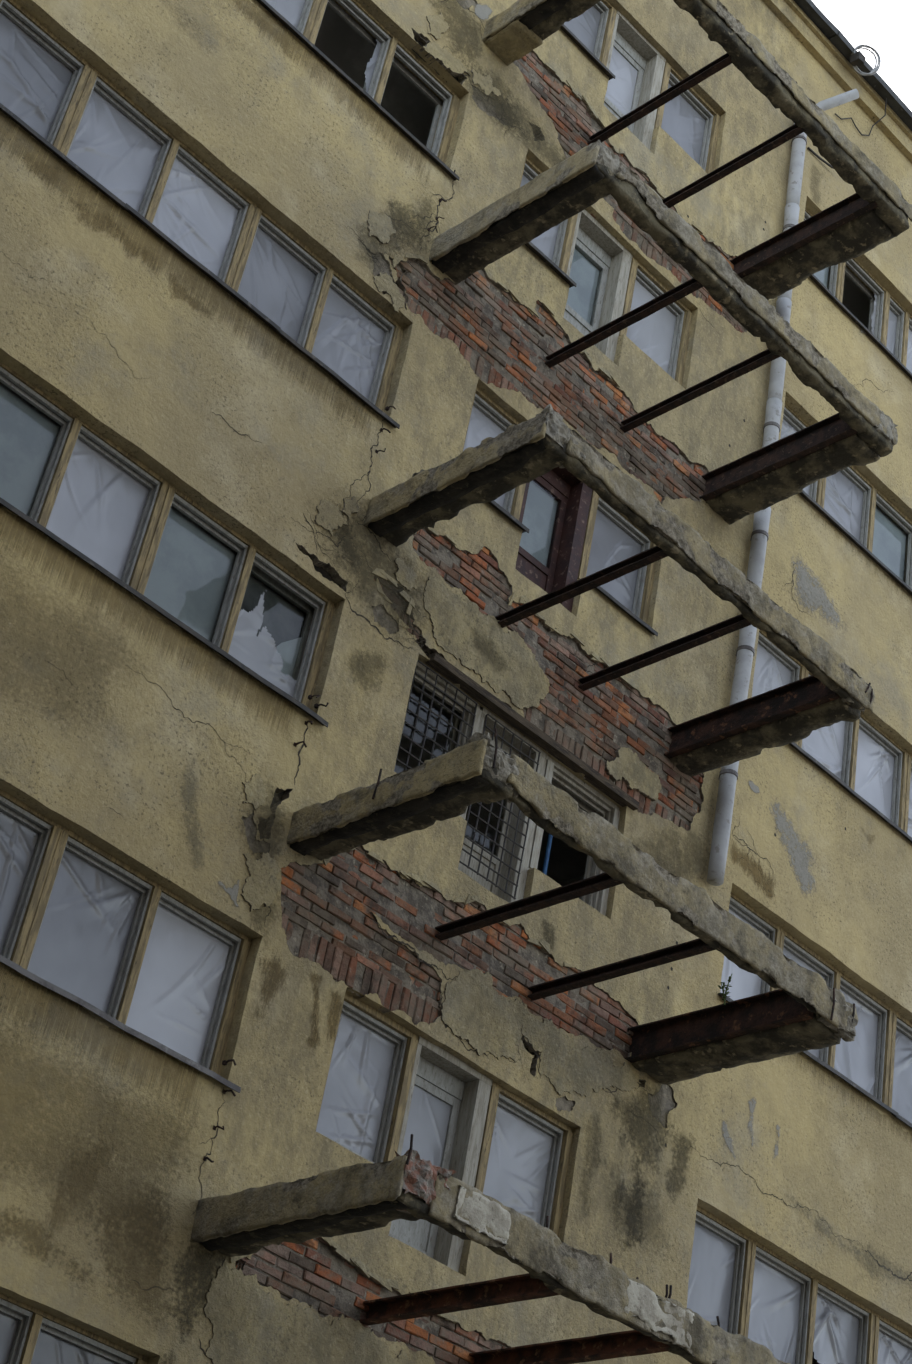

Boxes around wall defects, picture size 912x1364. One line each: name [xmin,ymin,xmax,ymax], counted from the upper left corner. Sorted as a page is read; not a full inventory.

flaking render [411,13,509,126]
flaking render [367,210,709,504]
flaking render [372,528,704,831]
crack [294,725,308,785]
flaking render [281,845,638,1059]
flaking render [521,1036,540,1077]
crack [194,1087,225,1213]
damp [667,1136,691,1199]
flaking render [230,1237,511,1364]